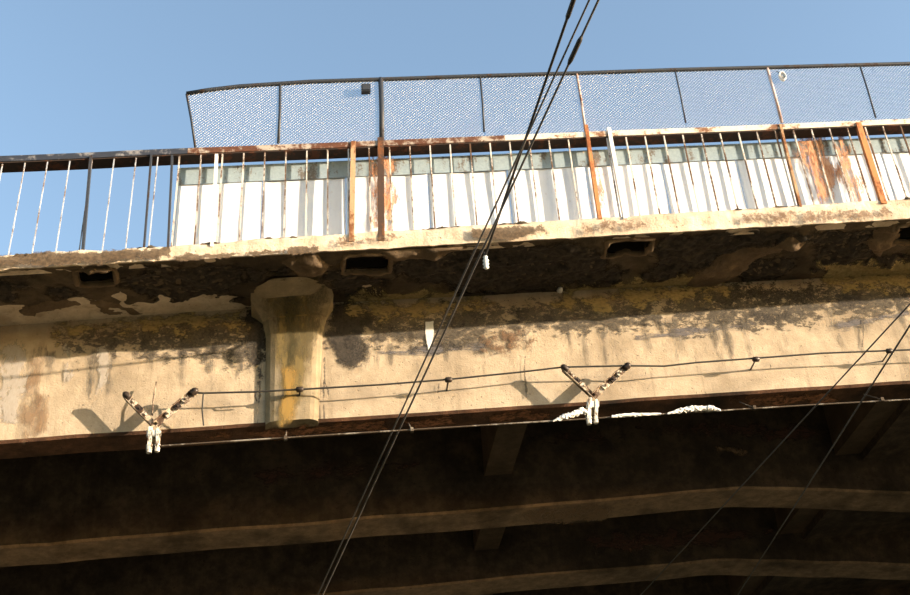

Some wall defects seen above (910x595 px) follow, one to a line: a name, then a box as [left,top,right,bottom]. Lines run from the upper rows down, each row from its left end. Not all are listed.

corrosion [369,156,400,231]
corrosion [796,136,867,203]
spalling [19,299,143,316]
leakage [47,276,910,426]